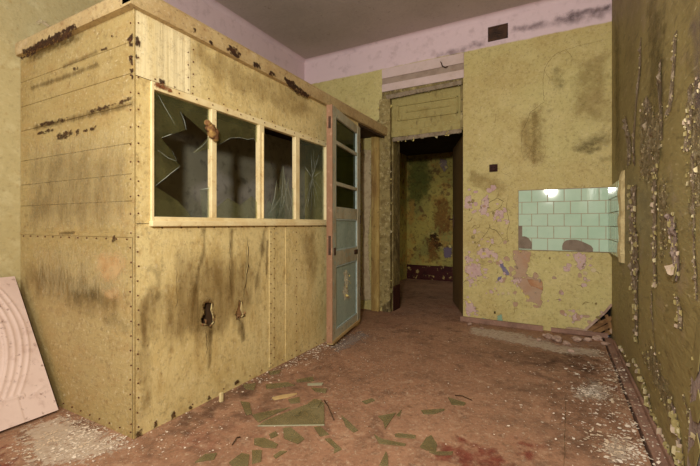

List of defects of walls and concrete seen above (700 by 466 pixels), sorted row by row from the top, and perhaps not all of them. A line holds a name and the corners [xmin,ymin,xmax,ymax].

peeling [464,30,700,466]